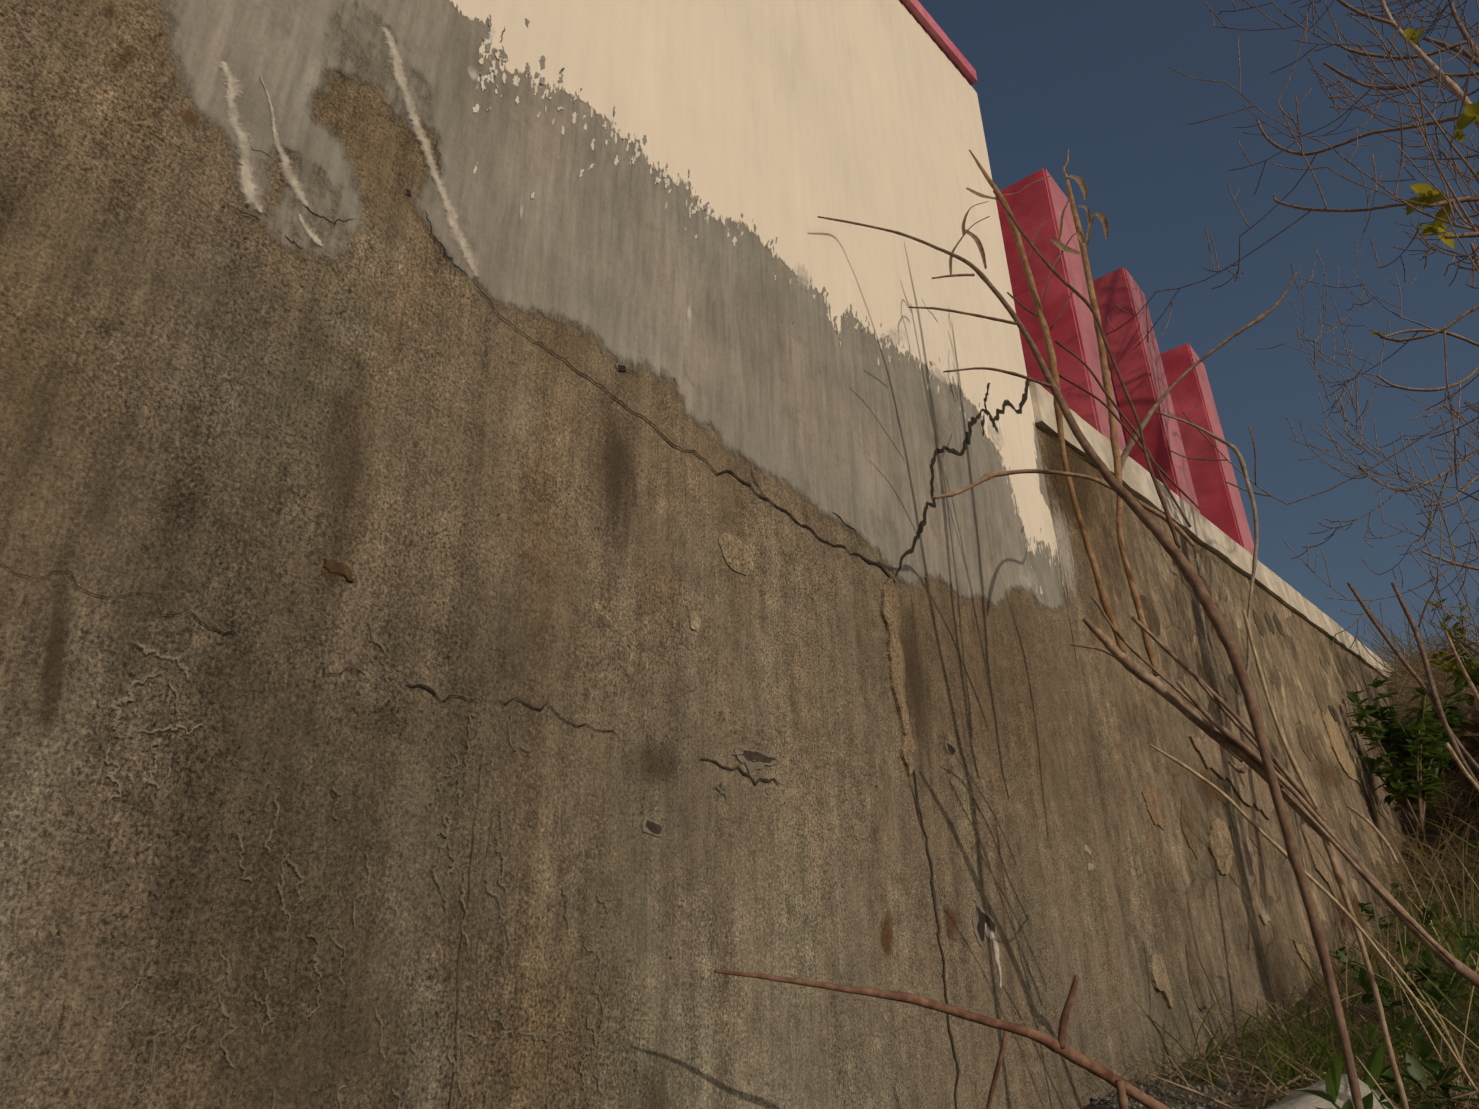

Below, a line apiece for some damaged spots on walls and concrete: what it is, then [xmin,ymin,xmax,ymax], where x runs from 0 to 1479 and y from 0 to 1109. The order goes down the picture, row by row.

efflorescence [220,62,263,212]
efflorescence [260,74,323,246]
peeling [472,14,714,238]
crack [425,211,1029,583]
peeling [727,213,1063,584]
crack [0,563,238,636]
peeling [322,558,355,582]
flaking render [718,533,755,576]
crack [405,684,630,742]
crack [909,770,959,1109]